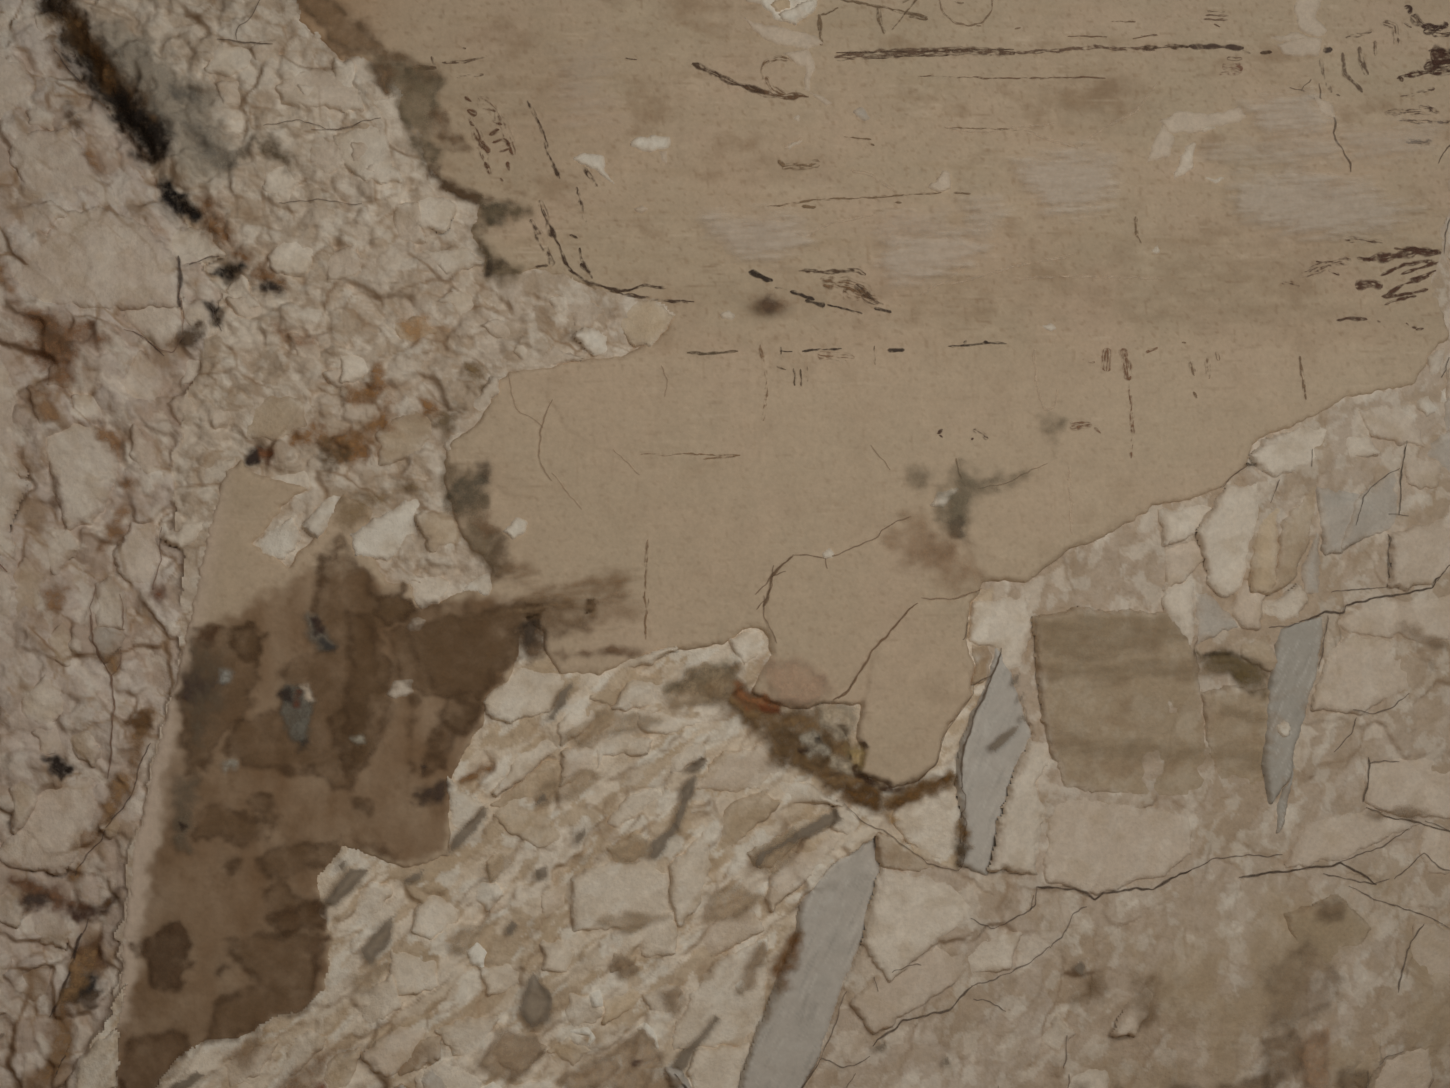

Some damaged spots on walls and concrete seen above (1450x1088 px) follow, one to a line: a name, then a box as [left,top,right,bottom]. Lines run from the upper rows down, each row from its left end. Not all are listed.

damp [40,0,287,168]
crack [124,256,221,356]
damp [179,302,221,347]
damp [159,181,284,291]
spalling [0,0,675,1088]
damp [273,538,627,807]
spalling [155,209,1450,1088]
corrosion [666,662,957,823]
crack [851,648,1002,871]
corrosion [956,821,970,864]
crack [802,694,1450,1088]
crack [1269,444,1450,669]